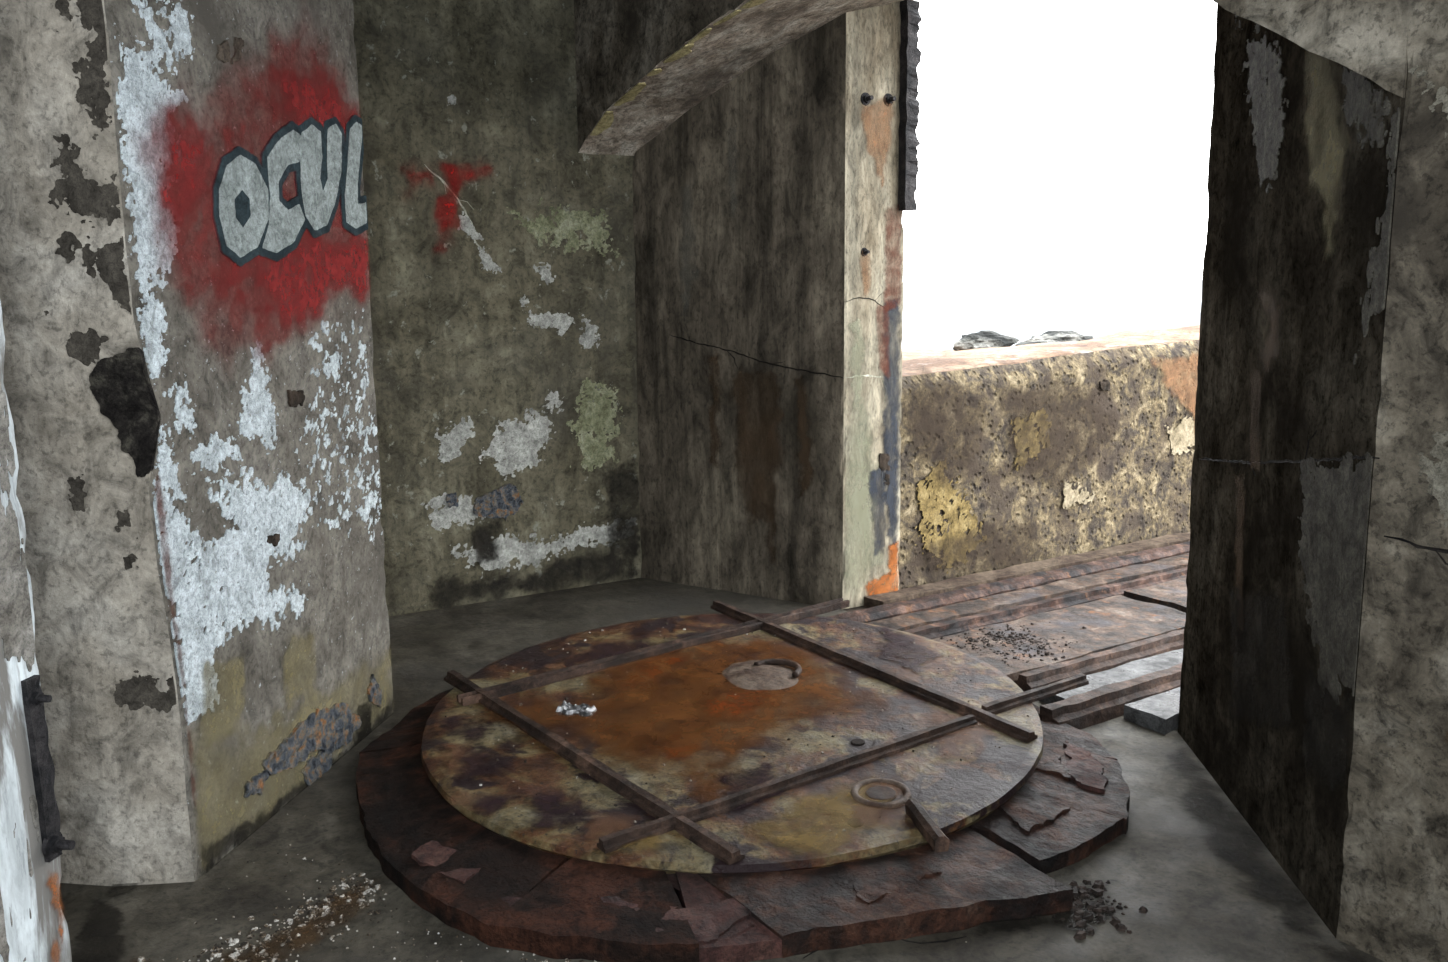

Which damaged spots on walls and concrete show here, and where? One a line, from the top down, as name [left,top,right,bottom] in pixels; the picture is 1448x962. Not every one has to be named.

peeling [1234,15,1289,194]
peeling [457,211,502,274]
peeling [506,197,622,285]
peeling [1341,66,1401,365]
peeling [48,0,383,725]
peeling [519,295,601,349]
corrosion [862,205,902,377]
peeling [420,377,625,579]
corrosion [866,541,899,596]
peeling [13,785,40,877]
peeling [0,890,26,962]